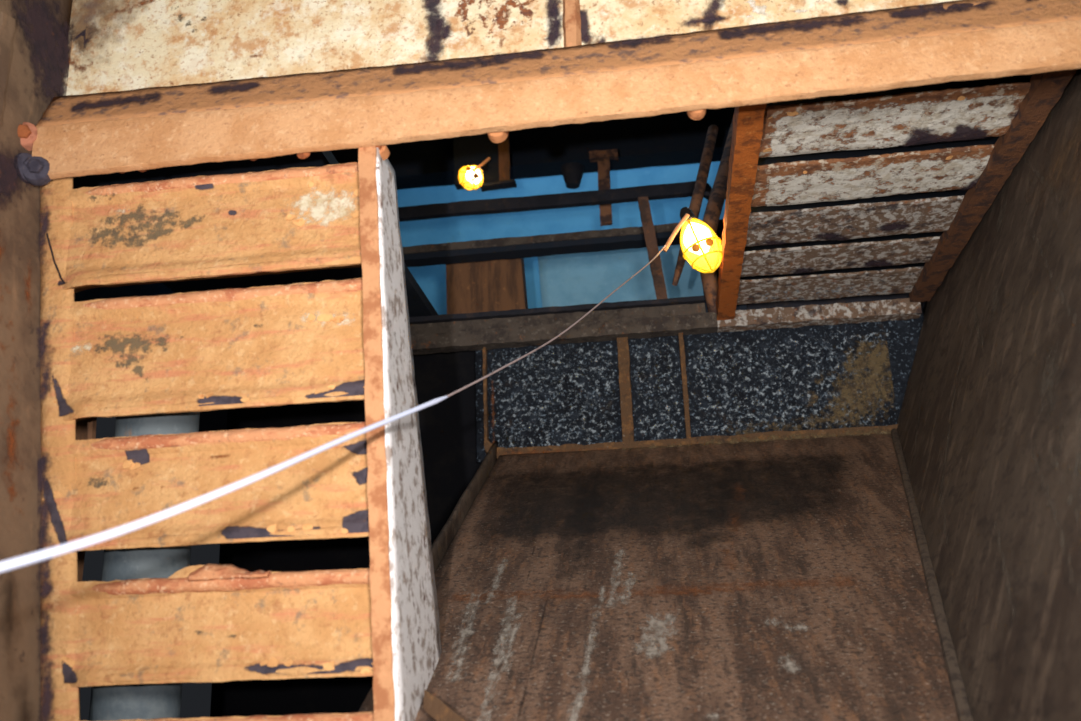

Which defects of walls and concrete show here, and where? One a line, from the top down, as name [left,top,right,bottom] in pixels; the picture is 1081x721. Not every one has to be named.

rust [393,0,561,75]
rust [580,10,671,49]
rust [684,0,865,40]
rust [890,0,993,18]
peeling [286,181,360,227]
water stain [689,333,888,432]
water stain [500,456,844,559]